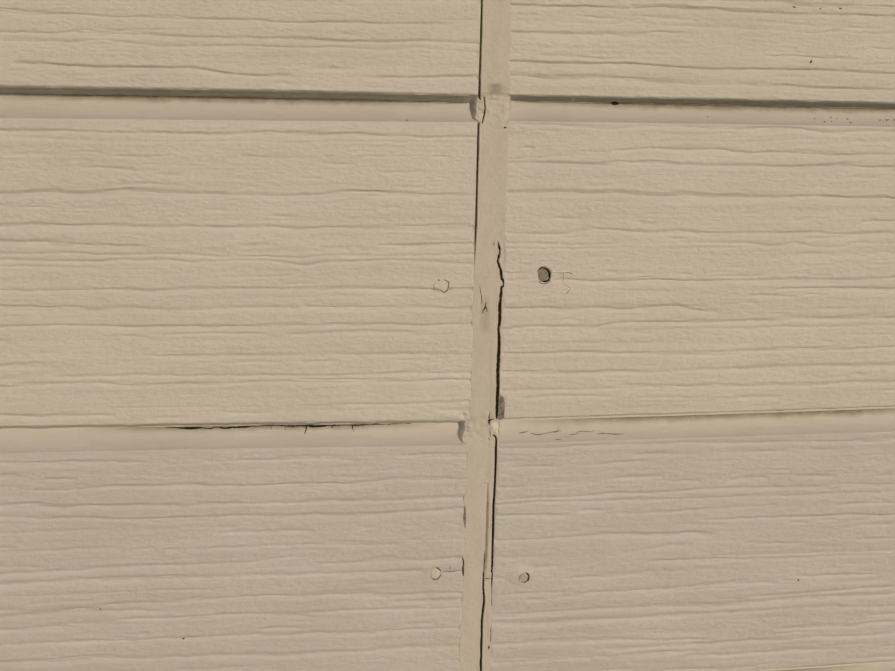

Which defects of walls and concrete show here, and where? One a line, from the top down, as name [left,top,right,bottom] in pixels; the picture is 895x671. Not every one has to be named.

crack [443,0,504,671]
crack [166,423,412,434]
crack [519,430,624,440]